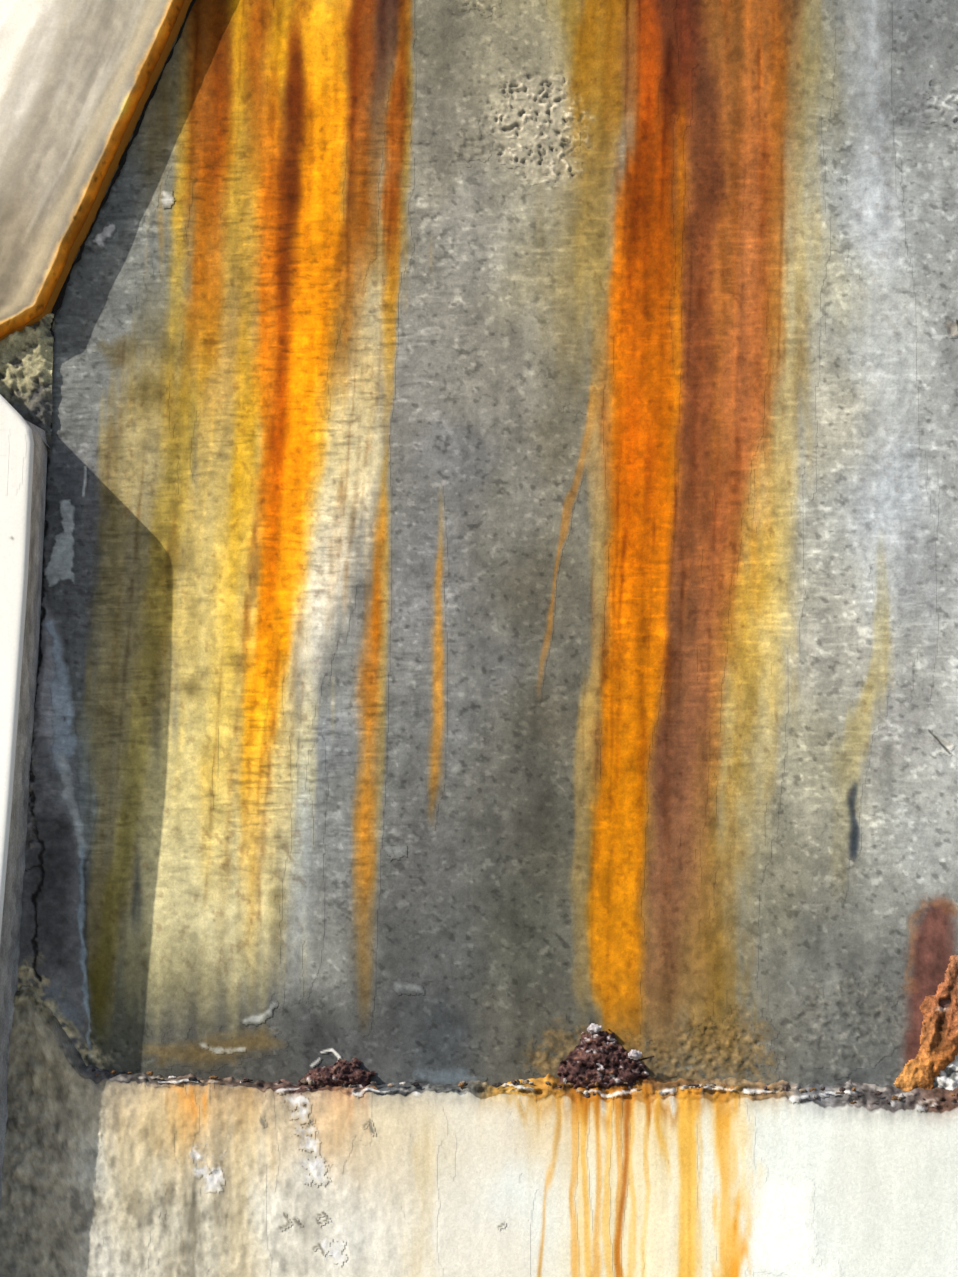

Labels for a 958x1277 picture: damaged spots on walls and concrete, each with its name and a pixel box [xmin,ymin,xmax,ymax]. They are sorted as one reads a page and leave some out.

crack [50,0,196,363]
crack [26,423,52,982]
corrosion [0,0,416,1277]
corrosion [426,484,449,830]
corrosion [532,0,837,1046]
corrosion [896,890,958,1076]
corrosion [506,1084,768,1277]